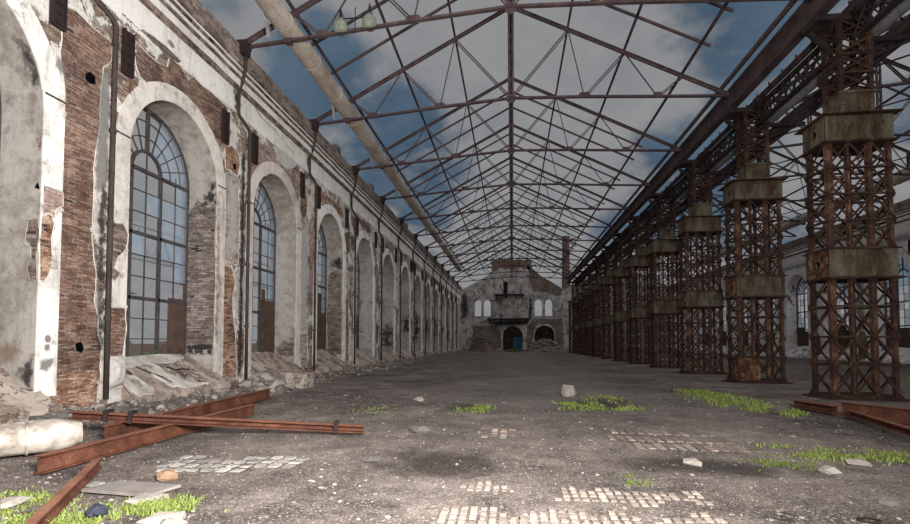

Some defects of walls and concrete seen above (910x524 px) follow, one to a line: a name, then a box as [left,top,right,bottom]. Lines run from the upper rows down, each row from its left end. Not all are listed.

flaking render [22,7,129,408]
water stain [96,71,110,351]
flaking render [135,29,240,380]
flaking render [275,331,308,368]
flaking render [251,139,344,298]